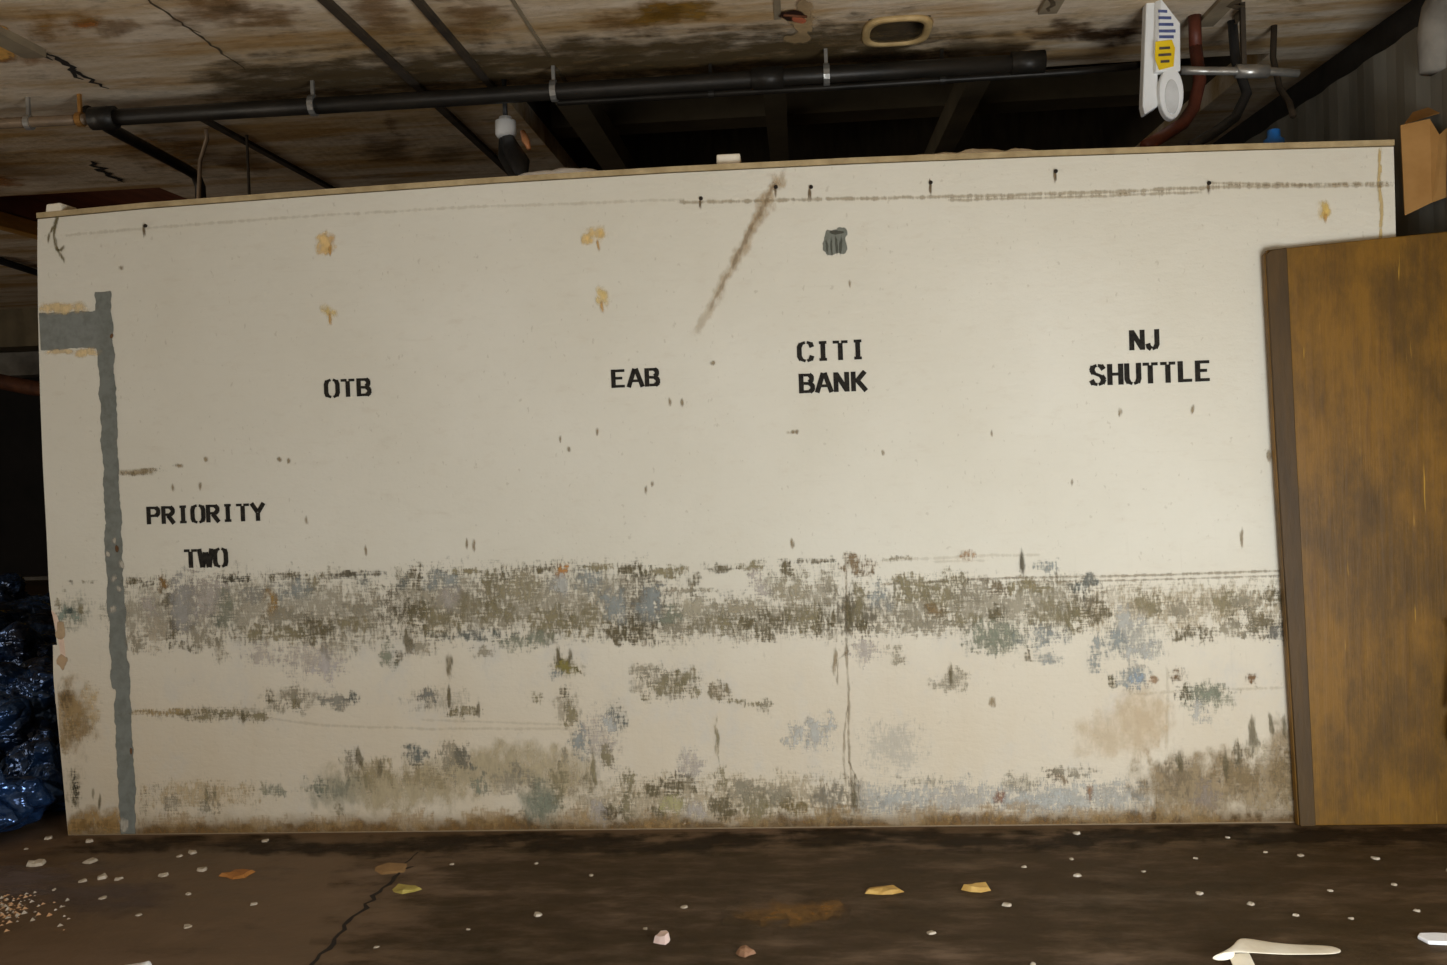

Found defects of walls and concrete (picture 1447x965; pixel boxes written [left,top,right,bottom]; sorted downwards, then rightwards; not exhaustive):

damp [34,15,115,34]
damp [185,0,288,26]
damp [197,0,1002,102]
damp [1034,20,1142,47]
peeling [39,291,1284,835]
crack [309,852,418,965]